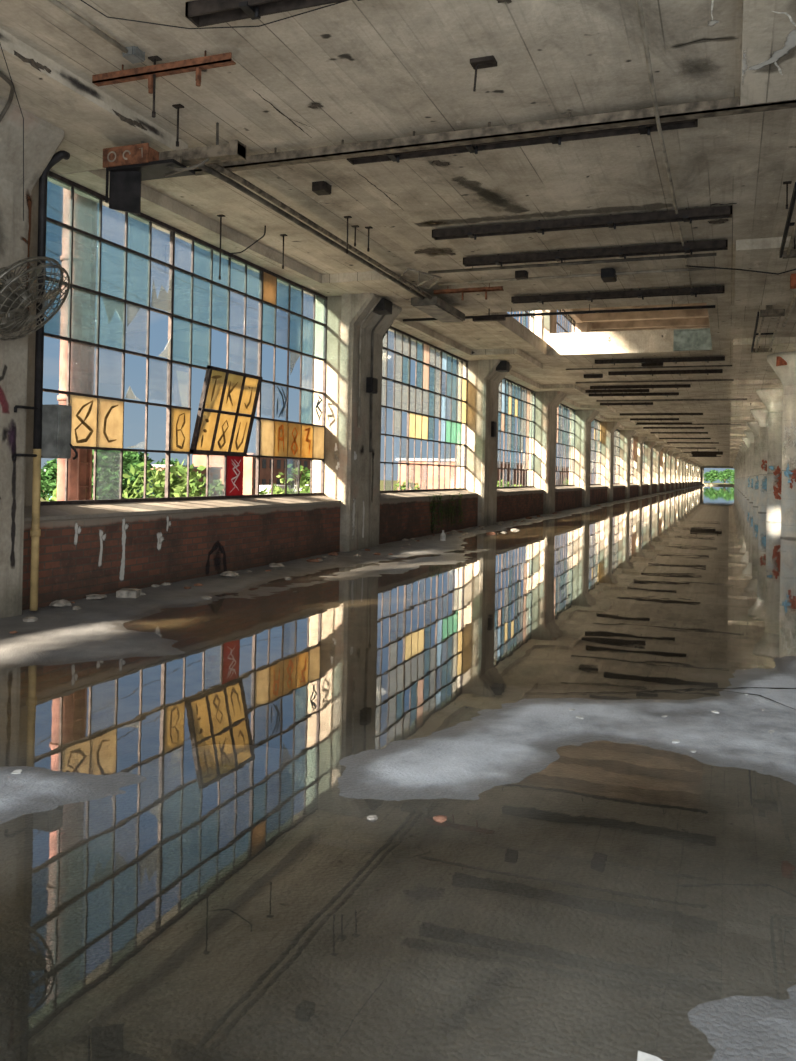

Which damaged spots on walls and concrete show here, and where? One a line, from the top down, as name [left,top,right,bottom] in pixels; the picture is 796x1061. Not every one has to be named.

peeling [748,460,796,500]